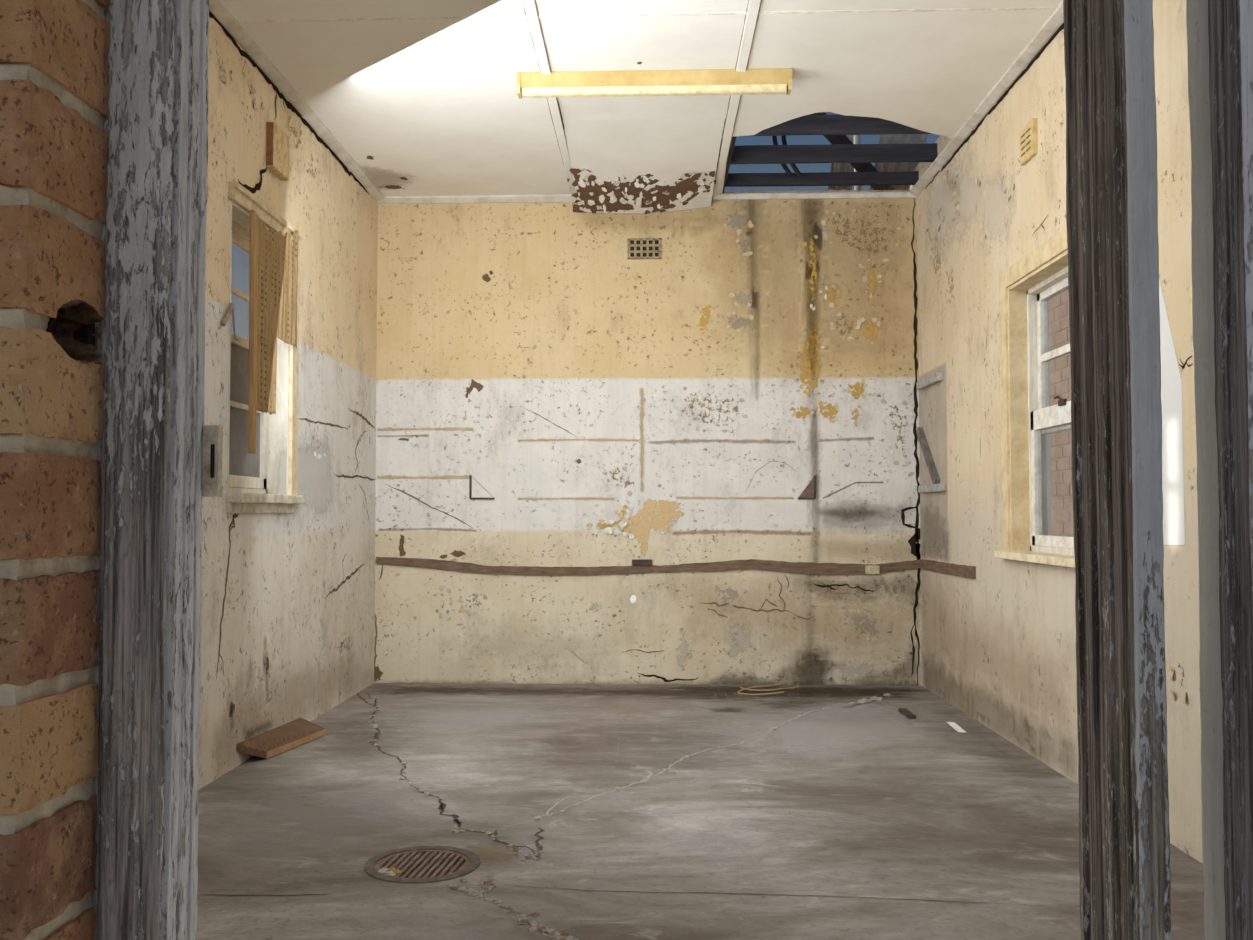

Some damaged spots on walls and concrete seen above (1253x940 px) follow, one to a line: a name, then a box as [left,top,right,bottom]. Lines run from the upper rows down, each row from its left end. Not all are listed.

crack [209,10,369,194]
peeling [567,168,716,214]
peeling [791,209,901,426]
peeling [587,465,684,560]
crack [357,0,1064,940]
peeling [880,399,914,477]